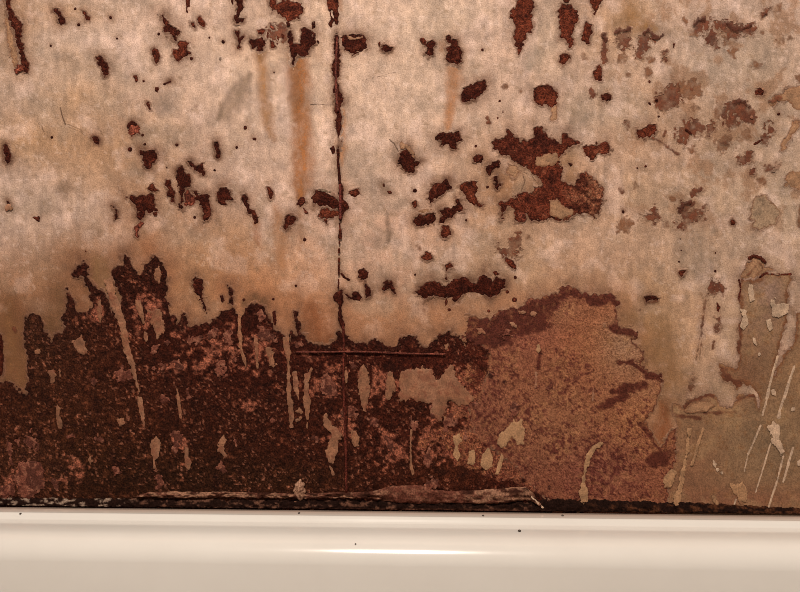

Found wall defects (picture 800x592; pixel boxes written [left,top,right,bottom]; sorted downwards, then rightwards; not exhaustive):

peeling [0,78,800,516]